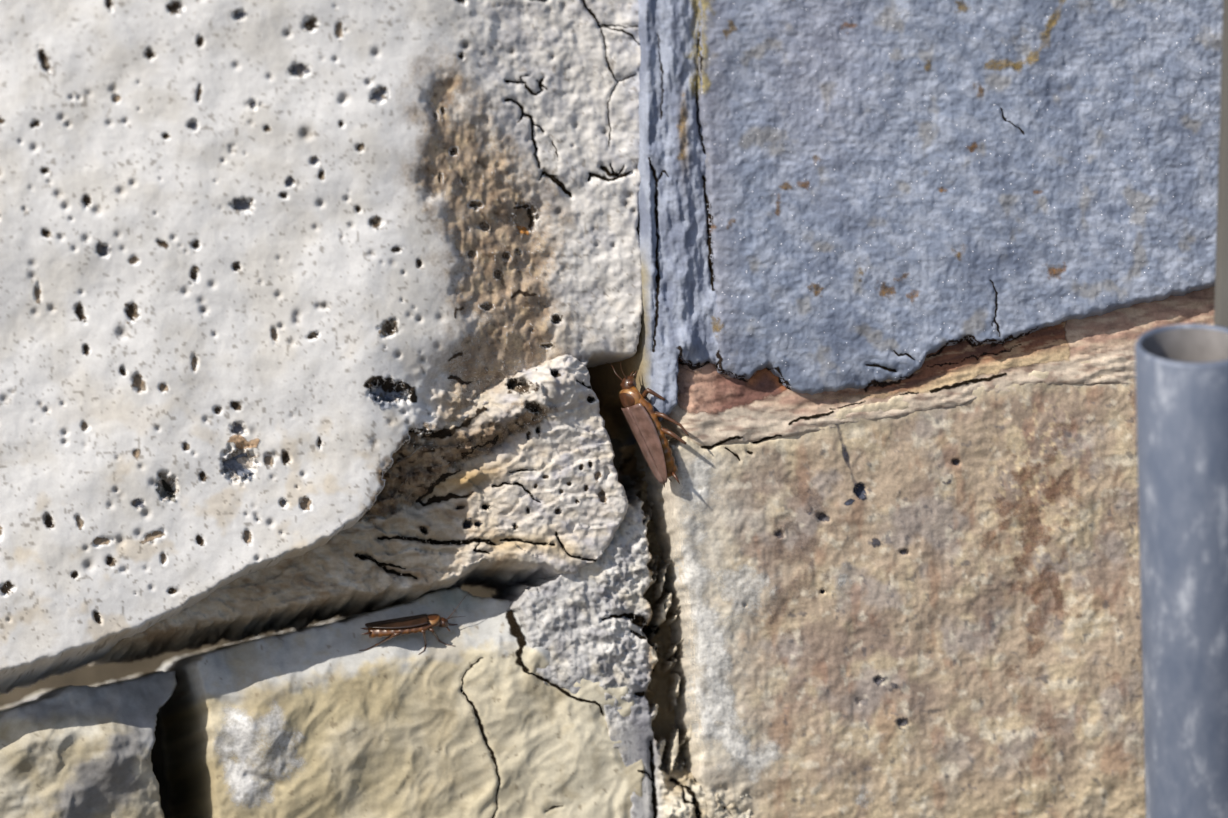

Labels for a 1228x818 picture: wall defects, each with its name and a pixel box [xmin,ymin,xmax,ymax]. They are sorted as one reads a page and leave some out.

crack [504,0,669,352]
crack [696,32,715,291]
spalling [356,73,561,529]
hole [559,460,606,504]
crack [460,657,500,818]
crack [506,610,603,715]
crack [637,740,732,818]